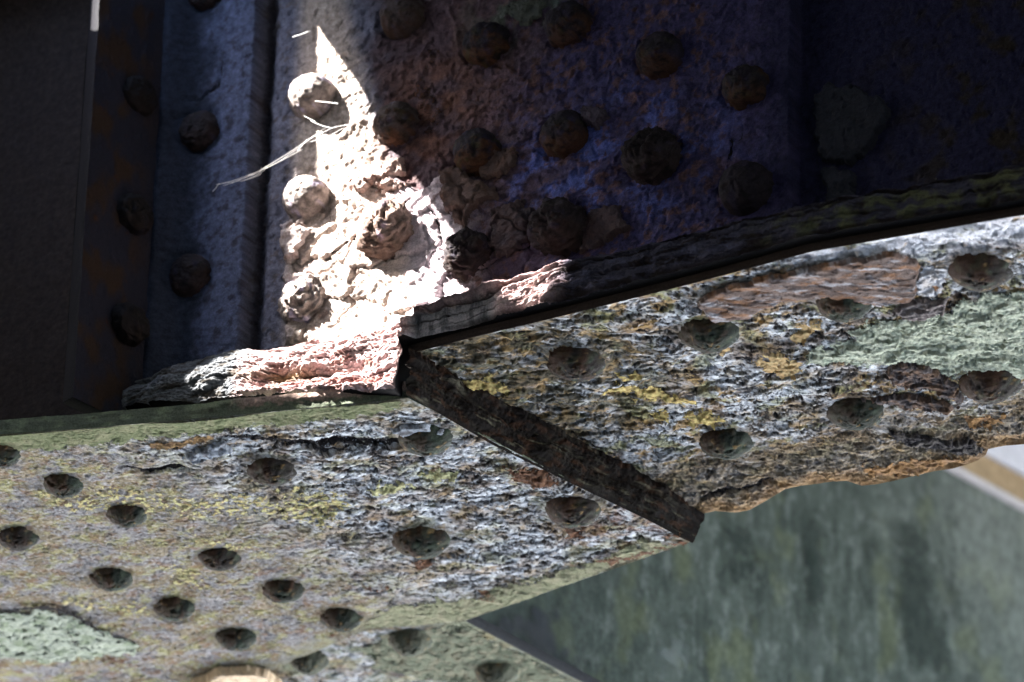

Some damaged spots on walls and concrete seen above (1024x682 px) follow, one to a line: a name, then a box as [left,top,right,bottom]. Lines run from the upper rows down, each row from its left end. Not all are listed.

peeling [696,251,949,323]
rust [501,465,564,490]
rust [861,452,968,479]
rust [564,526,586,539]